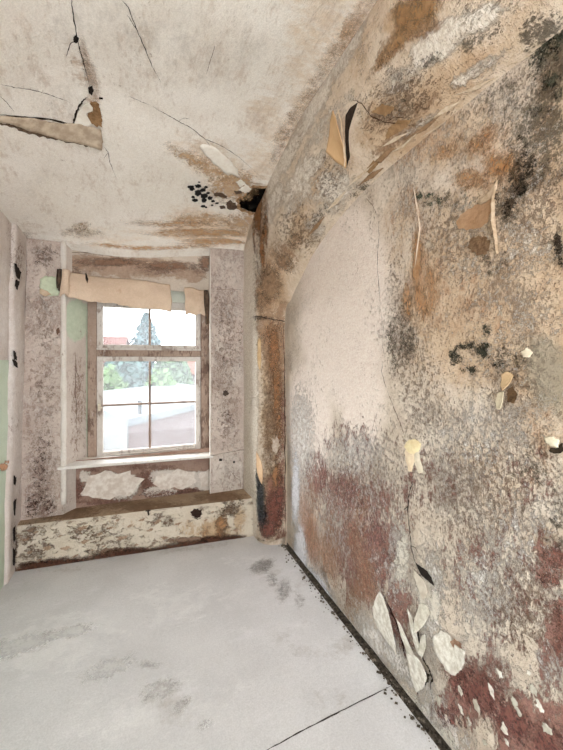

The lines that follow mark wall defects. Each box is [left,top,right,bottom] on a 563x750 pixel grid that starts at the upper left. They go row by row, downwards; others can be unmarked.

crack [66,0,90,86]
peeling [0,86,103,151]
crack [354,100,419,126]
damp [175,150,253,231]
damp [457,127,542,220]
corrosion [259,321,283,447]
damp [448,323,504,375]
peeling [79,470,144,500]
peeling [153,469,210,490]
damp [291,451,330,596]
crack [405,471,419,564]
peeling [372,569,465,721]